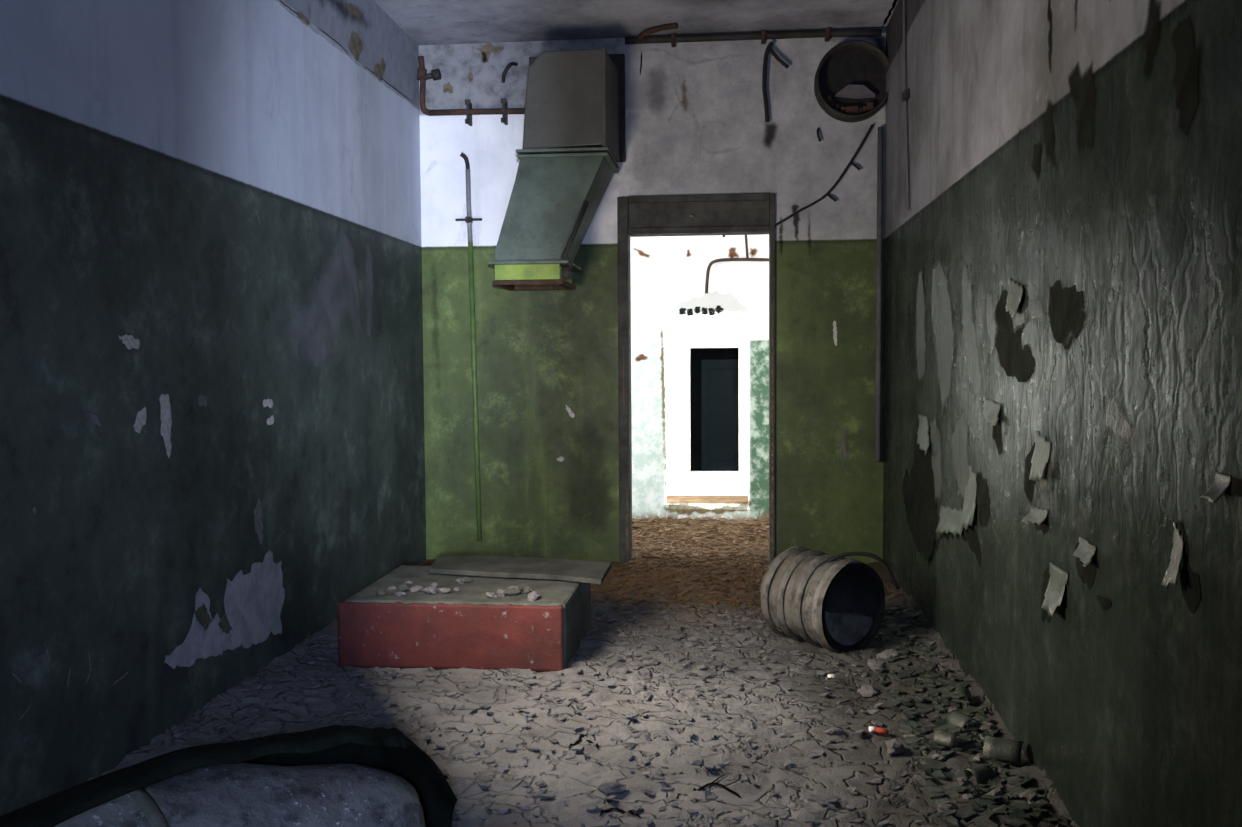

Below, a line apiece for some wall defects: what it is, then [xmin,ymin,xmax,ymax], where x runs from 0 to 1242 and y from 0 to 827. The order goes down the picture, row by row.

peeling [117,334,140,350]
peeling [133,393,172,458]
peeling [902,260,1084,568]
peeling [1200,473,1242,503]
peeling [164,498,285,669]
peeling [1040,537,1111,622]
peeling [1161,520,1200,613]
crack [568,734,599,749]
crack [599,808,641,818]
crack [676,775,741,799]